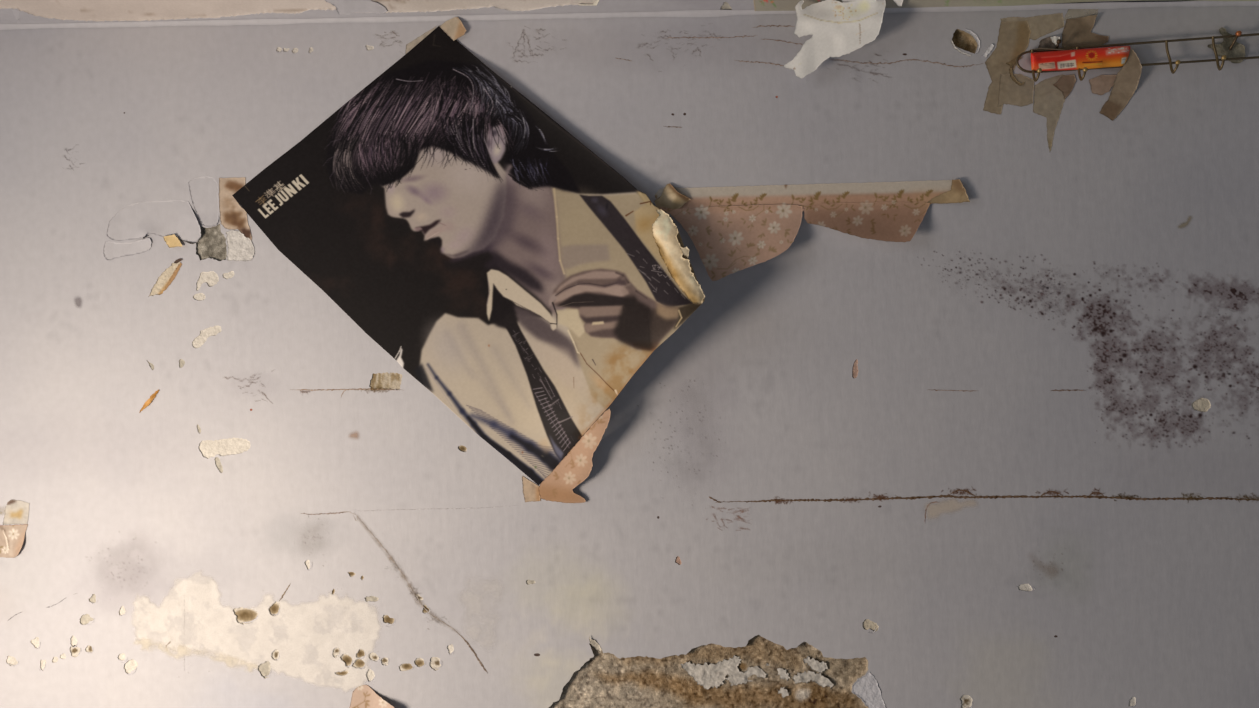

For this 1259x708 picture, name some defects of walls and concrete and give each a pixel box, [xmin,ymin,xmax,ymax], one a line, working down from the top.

peeling [0,0,599,24]
peeling [103,176,255,301]
leakage [945,257,1259,447]
crack [709,489,1259,519]
spalling [233,601,280,625]
crack [301,505,515,672]
spalling [258,649,280,679]
flaking render [549,635,886,708]